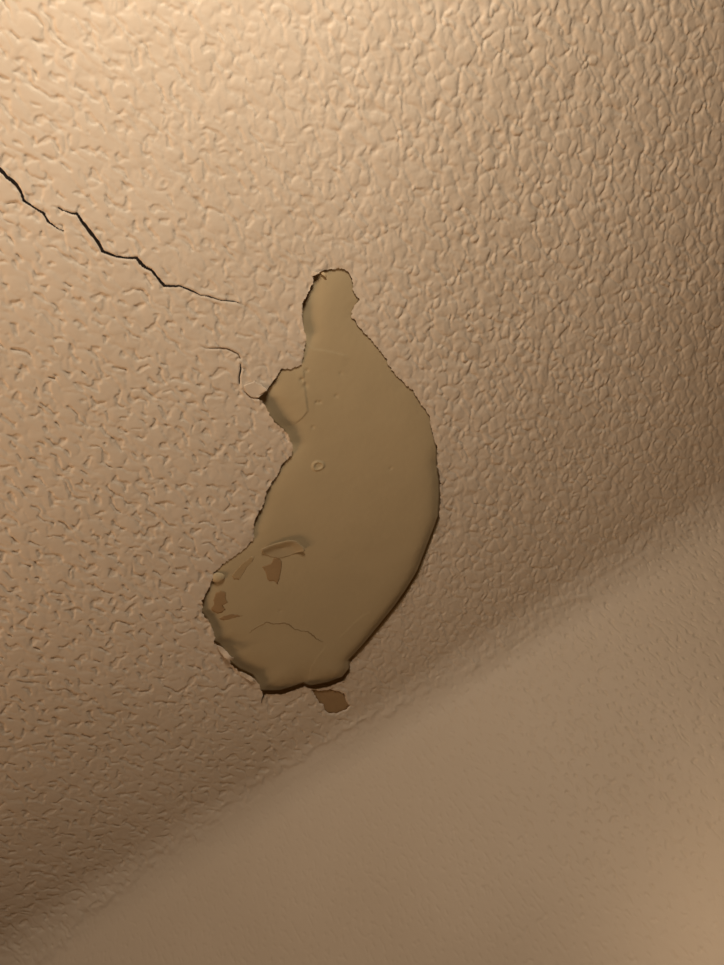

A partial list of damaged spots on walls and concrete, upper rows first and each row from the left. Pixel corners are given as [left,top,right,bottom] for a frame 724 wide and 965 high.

crack [0,167,238,303]
peeling [201,268,441,713]